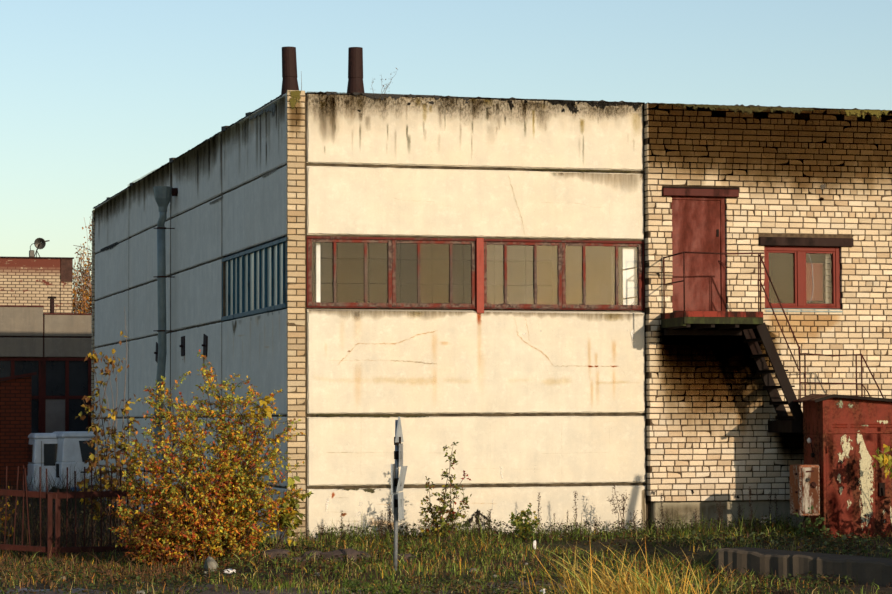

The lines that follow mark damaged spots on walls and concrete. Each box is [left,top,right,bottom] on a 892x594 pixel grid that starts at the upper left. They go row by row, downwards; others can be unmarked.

water stain [97,131,225,213]
water stain [292,92,892,194]
peeling [837,420,892,530]